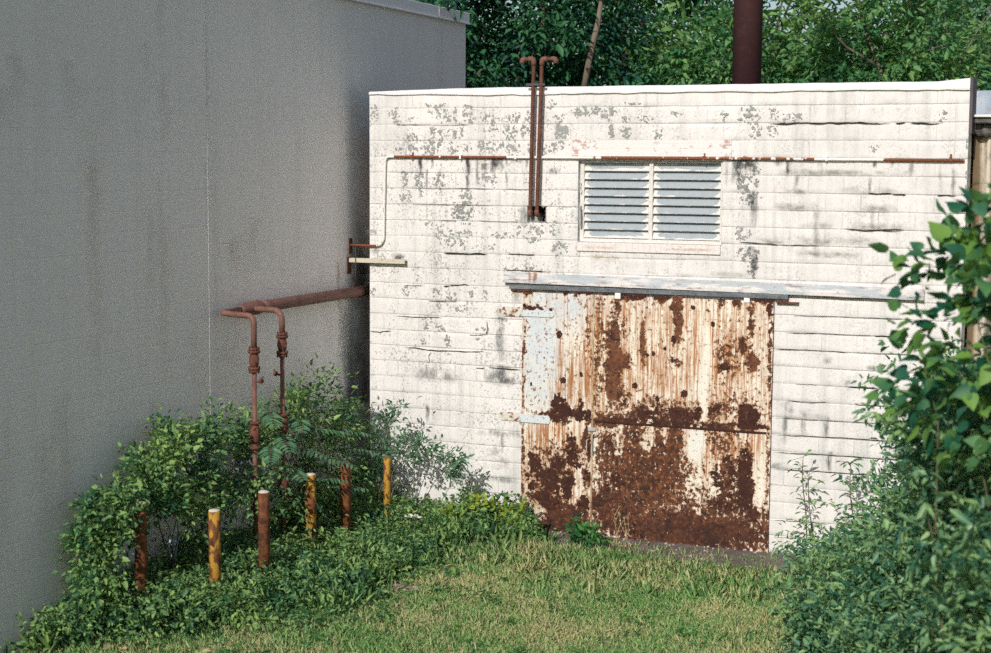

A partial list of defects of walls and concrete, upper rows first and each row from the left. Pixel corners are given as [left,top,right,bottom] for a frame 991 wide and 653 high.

peeling [370,99,662,156]
peeling [734,156,762,205]
peeling [425,170,497,249]
spalling [488,205,580,256]
peeling [735,226,760,278]
rust [563,290,695,404]
water stain [347,358,368,408]
rust [548,377,591,423]
rust [609,390,722,427]
rust [737,404,767,429]
rust [525,436,624,512]
rust [708,448,761,522]